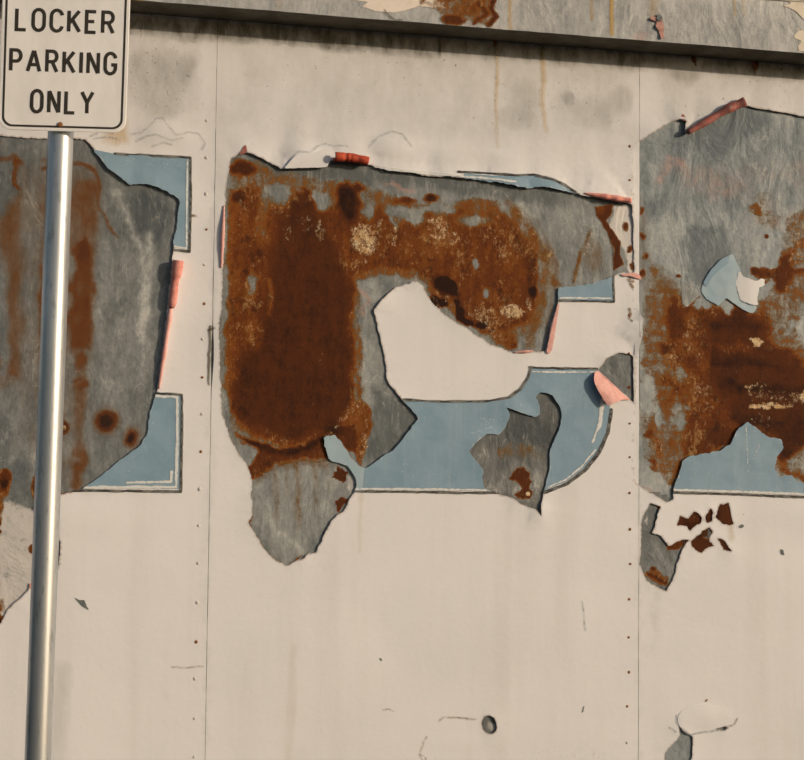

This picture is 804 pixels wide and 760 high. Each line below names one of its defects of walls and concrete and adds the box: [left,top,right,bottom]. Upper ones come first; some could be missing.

peeling [357,0,499,27]
peeling [794,30,804,51]
corrosion [0,468,12,533]
peeling [0,136,47,618]
corrosion [67,162,119,408]
peeling [61,139,184,493]
corrosion [221,158,561,480]
peeling [211,97,804,591]
corrosion [509,467,533,499]
corrosion [665,540,684,550]
corrosion [595,199,804,492]
peeling [665,727,693,760]